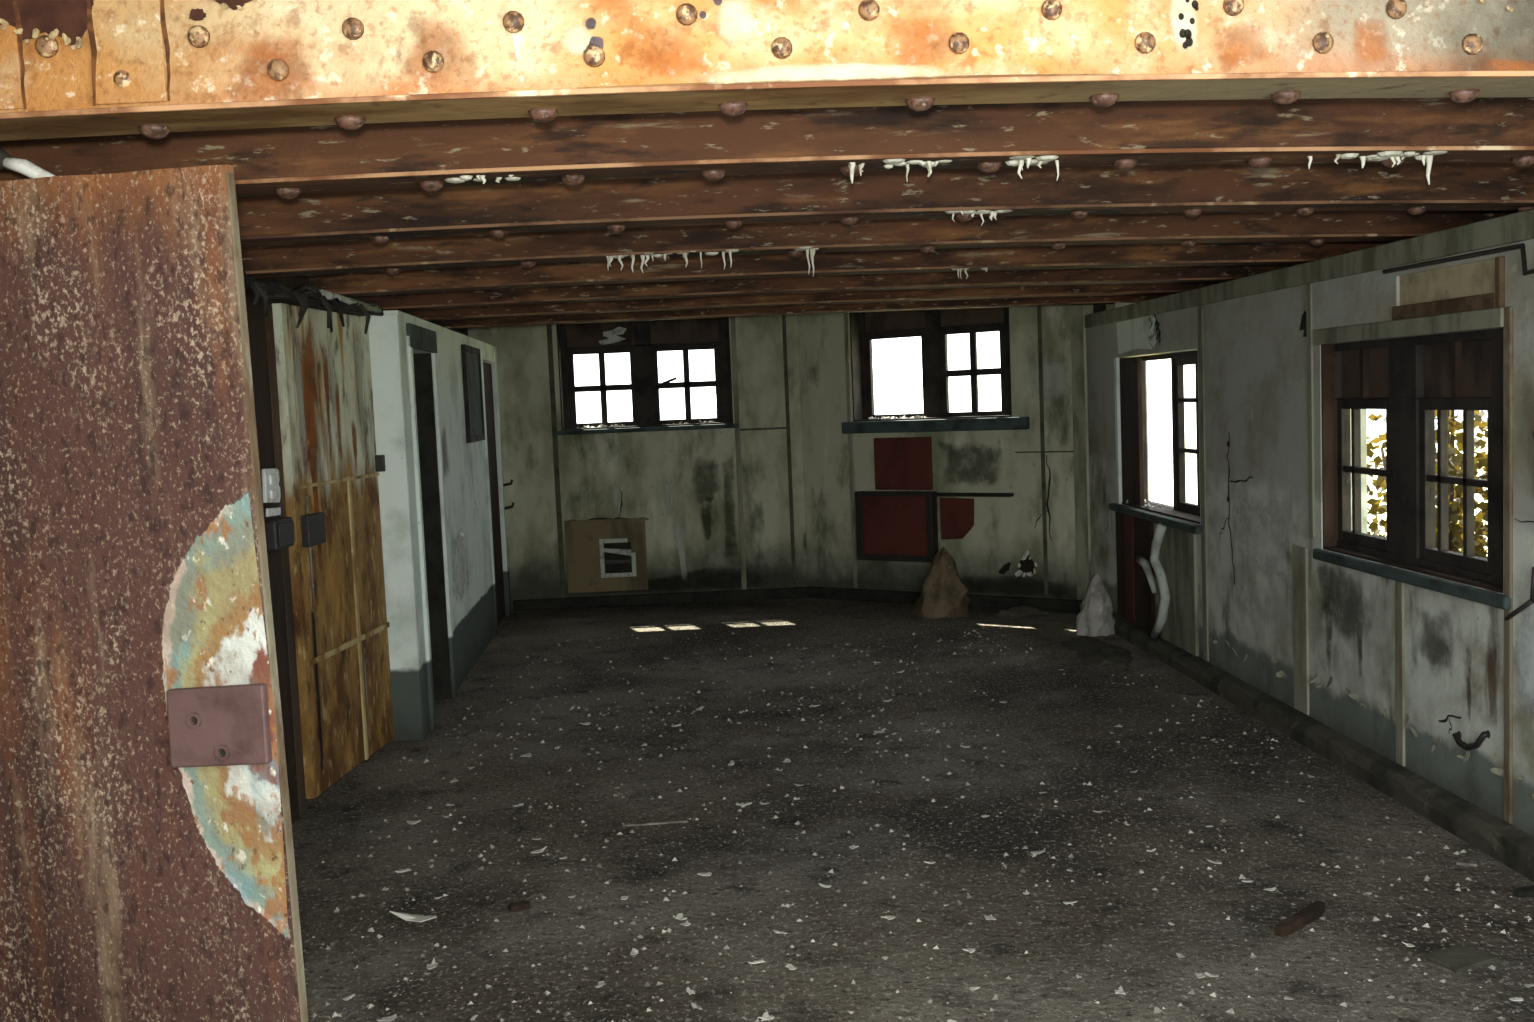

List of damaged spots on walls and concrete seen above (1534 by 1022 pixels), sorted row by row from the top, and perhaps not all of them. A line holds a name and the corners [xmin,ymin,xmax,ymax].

peeling [0,0,94,49]
peeling [189,0,257,21]
rust [13,0,27,109]
rust [86,0,97,106]
rust [160,0,170,101]
leakage [848,162,865,183]
leakage [883,159,952,182]
leakage [1005,155,1059,181]
efflorescence [1334,151,1447,185]
leakage [606,249,739,273]
leakage [794,246,819,277]
leakage [1426,621,1446,662]